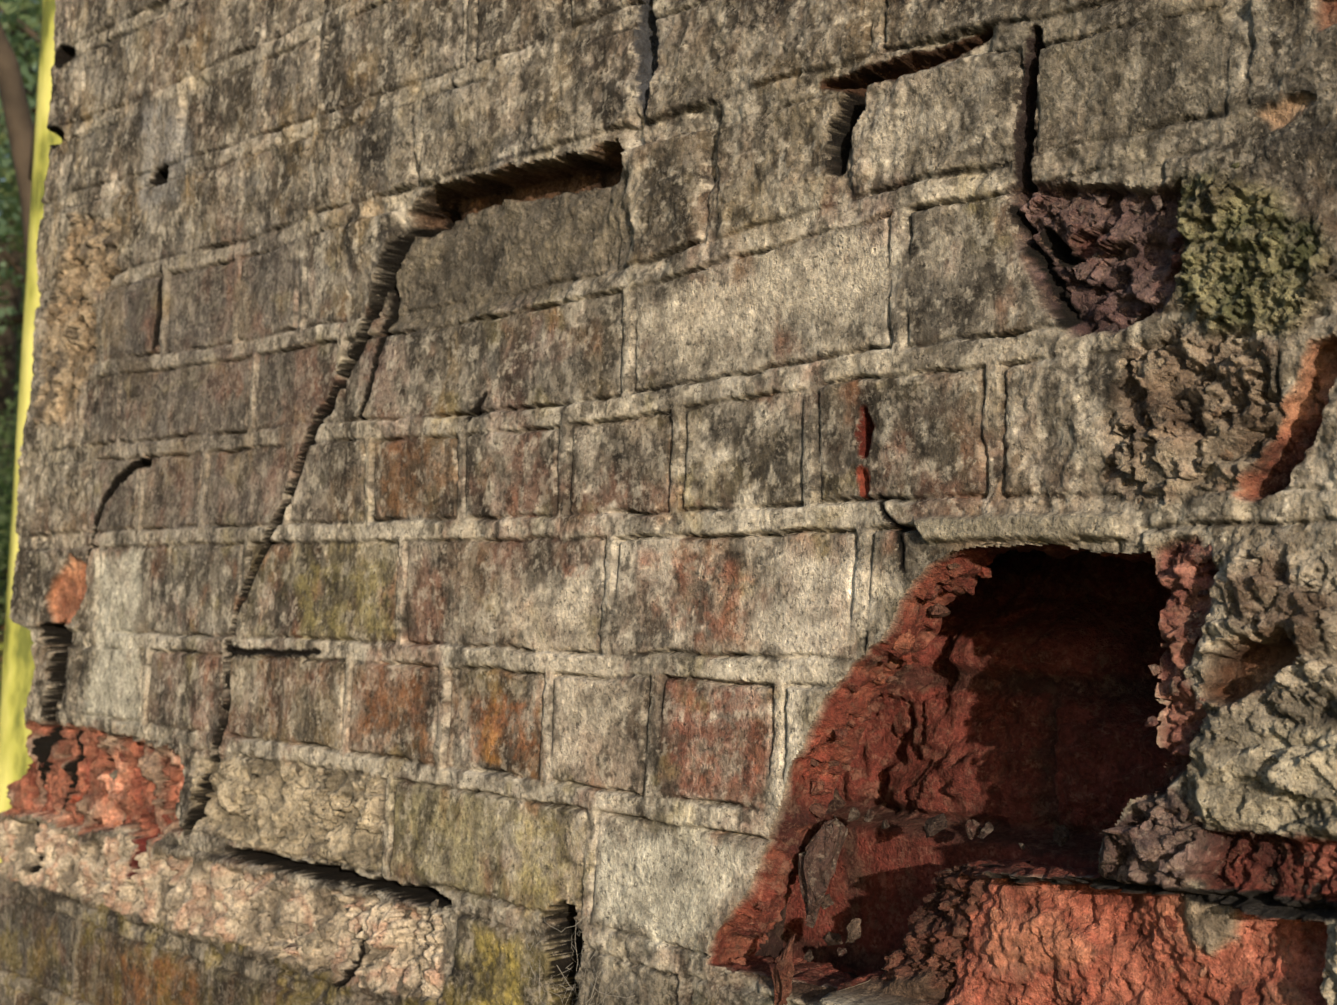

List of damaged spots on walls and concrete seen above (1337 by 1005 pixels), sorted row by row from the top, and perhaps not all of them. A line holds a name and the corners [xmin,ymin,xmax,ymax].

crack [87,456,157,561]
crack [183,205,462,838]
crack [466,390,488,423]
spalling [1007,179,1337,514]
spalling [0,551,448,1005]
spalling [705,532,1337,1005]